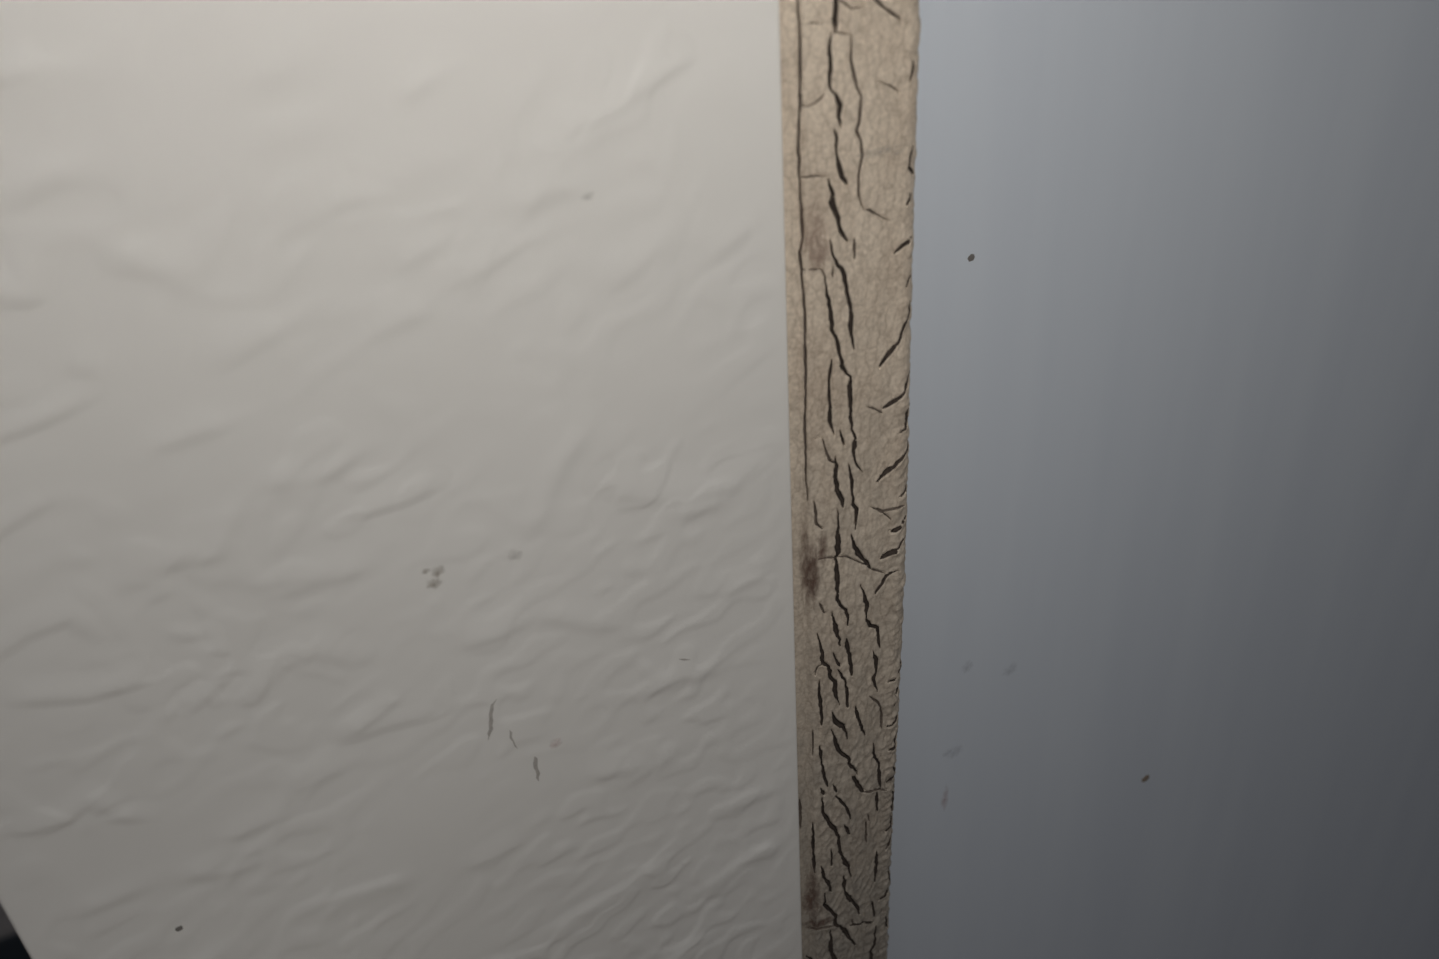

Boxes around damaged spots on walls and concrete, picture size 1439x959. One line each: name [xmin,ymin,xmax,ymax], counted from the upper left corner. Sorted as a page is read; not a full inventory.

crack [796,0,915,959]